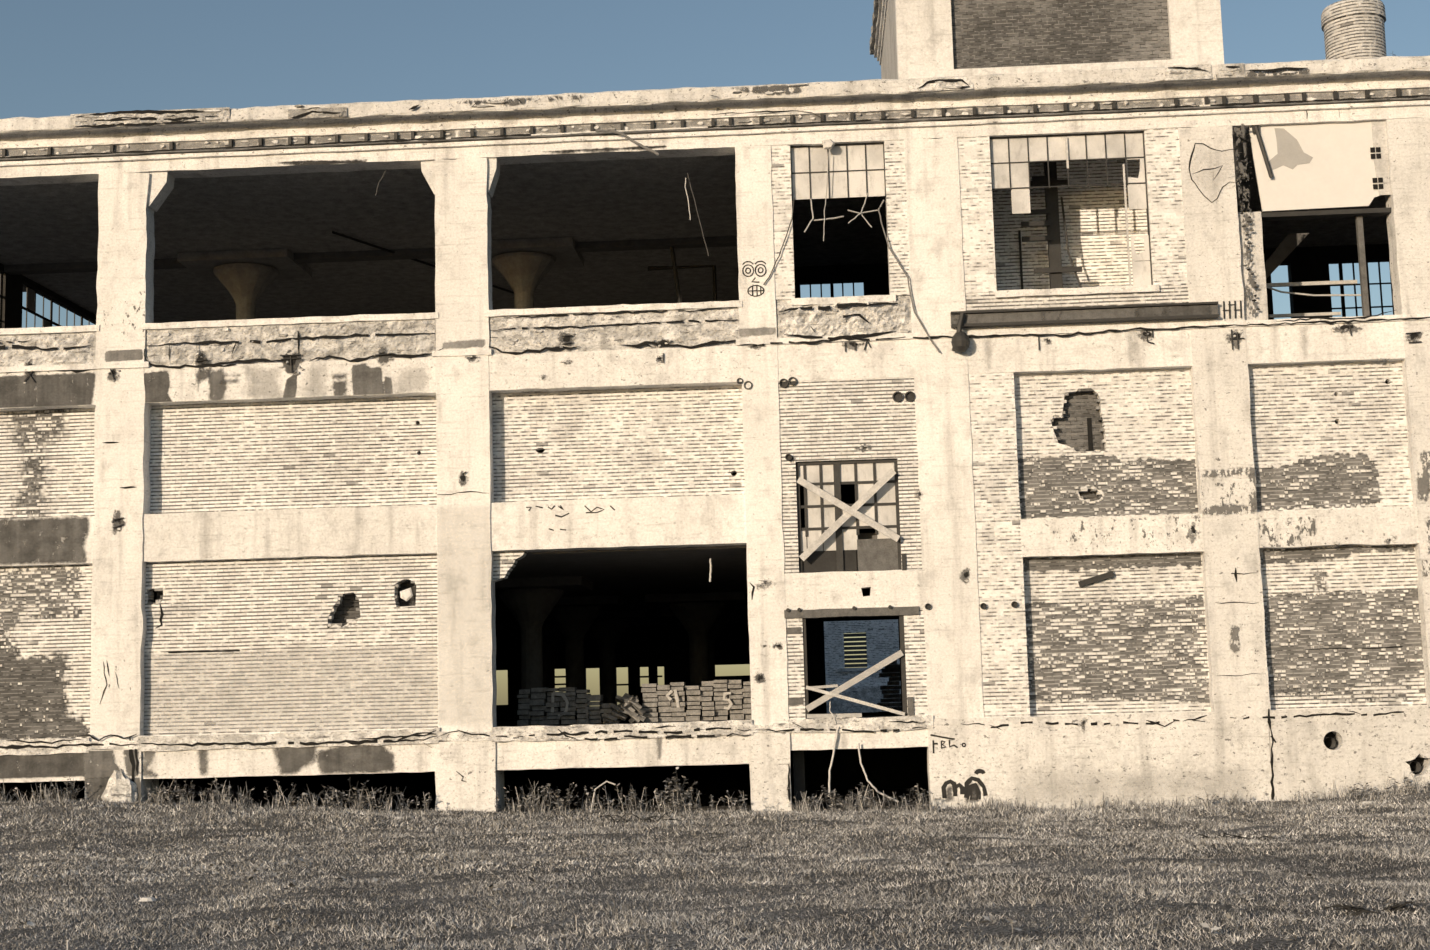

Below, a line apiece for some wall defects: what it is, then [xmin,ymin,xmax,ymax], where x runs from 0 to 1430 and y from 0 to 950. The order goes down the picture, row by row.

spalling [1406,332,1422,343]
water stain [105,349,172,403]
water stain [196,368,237,400]
water stain [333,363,392,396]
water stain [0,373,95,565]
peeling [1018,388,1430,707]
spalling [394,579,416,606]
crack [1215,568,1259,604]
spalling [328,594,360,629]
crack [1305,644,1403,652]
water stain [274,745,394,774]
crack [963,709,1404,801]